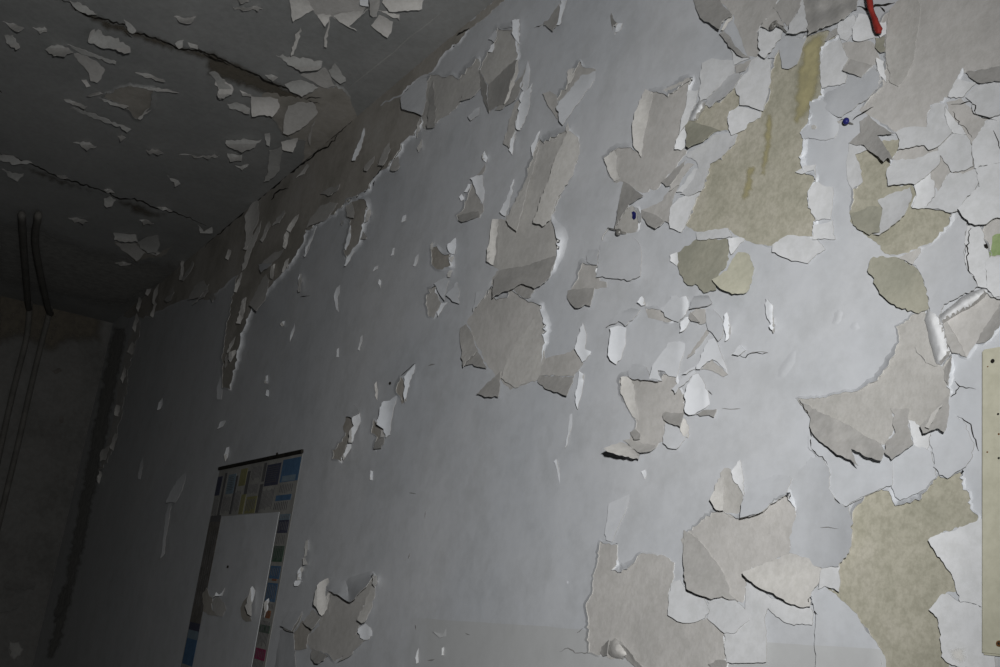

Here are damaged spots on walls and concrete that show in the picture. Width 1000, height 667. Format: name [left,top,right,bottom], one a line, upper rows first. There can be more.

peeling [3,21,47,50]
peeling [70,1,95,15]
peeling [45,29,178,142]
crack [62,0,320,103]
peeling [0,155,32,182]
crack [0,121,352,247]
peeling [97,0,596,483]
peeling [567,0,1000,667]
peeling [294,540,308,586]
peeling [274,571,378,667]